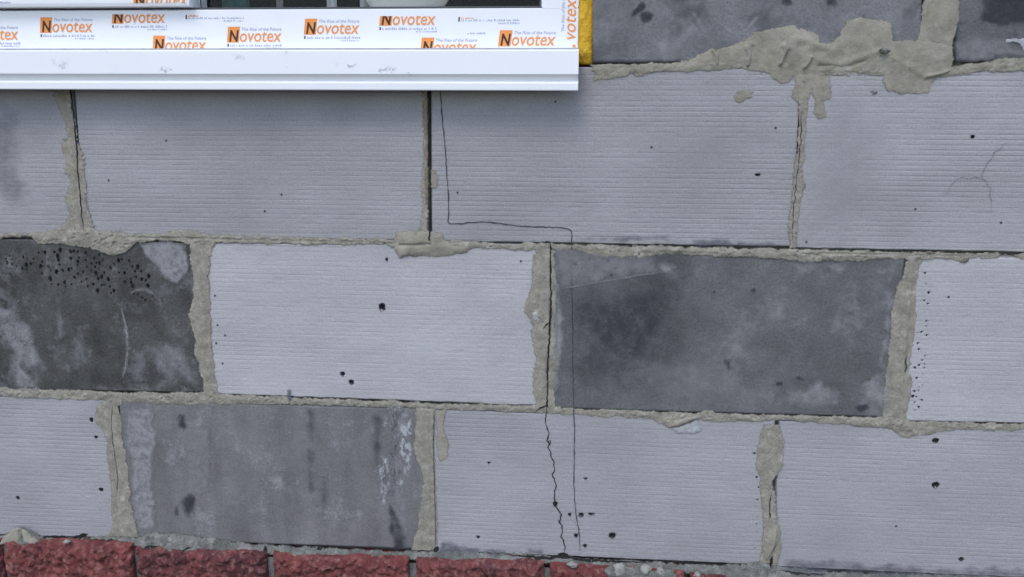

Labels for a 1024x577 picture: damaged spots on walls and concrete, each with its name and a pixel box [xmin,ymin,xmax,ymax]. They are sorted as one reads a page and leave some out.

crack [70,90,84,230]
crack [792,110,802,239]
crack [947,141,1008,206]
crack [440,91,580,553]
damp [389,412,413,547]